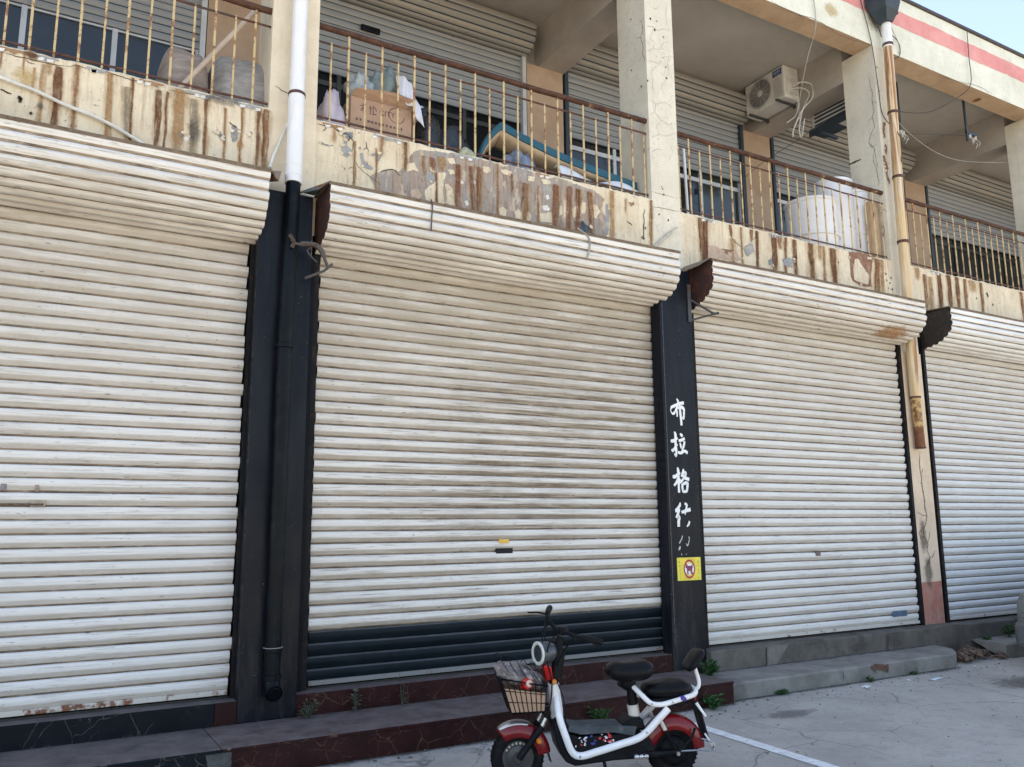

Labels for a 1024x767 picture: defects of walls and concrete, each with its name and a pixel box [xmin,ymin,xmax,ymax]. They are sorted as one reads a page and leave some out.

corrosion [23,50,80,127]
corrosion [154,90,184,147]
corrosion [238,107,269,167]
peeling [319,122,611,237]
corrosion [455,164,482,210]
corrosion [511,174,539,222]
corrosion [552,184,595,234]
corrosion [698,217,708,260]
corrosion [729,225,837,283]
corrosion [917,268,984,312]
corrosion [877,327,906,339]
crack [919,461,935,575]